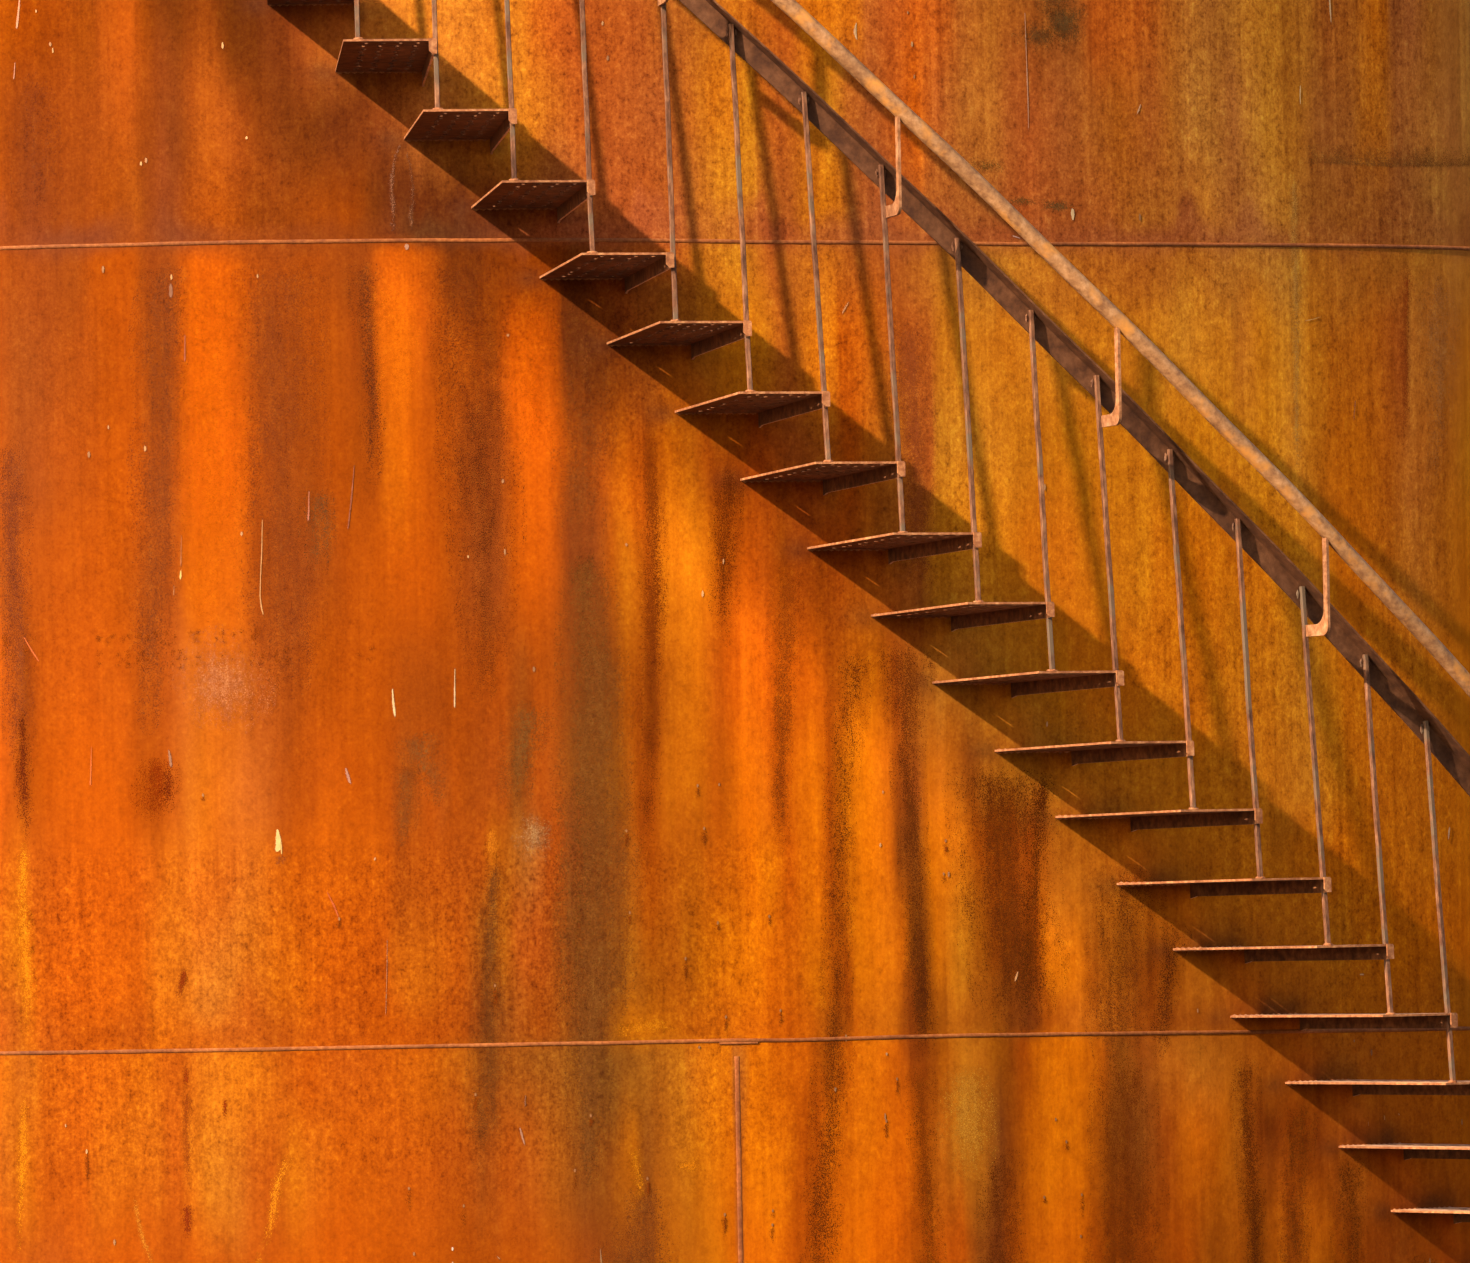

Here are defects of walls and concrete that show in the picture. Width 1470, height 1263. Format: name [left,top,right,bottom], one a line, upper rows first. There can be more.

corrosion [13,842,37,1036]
corrosion [14,1096,31,1249]
corrosion [179,1065,195,1236]
corrosion [256,1152,292,1263]